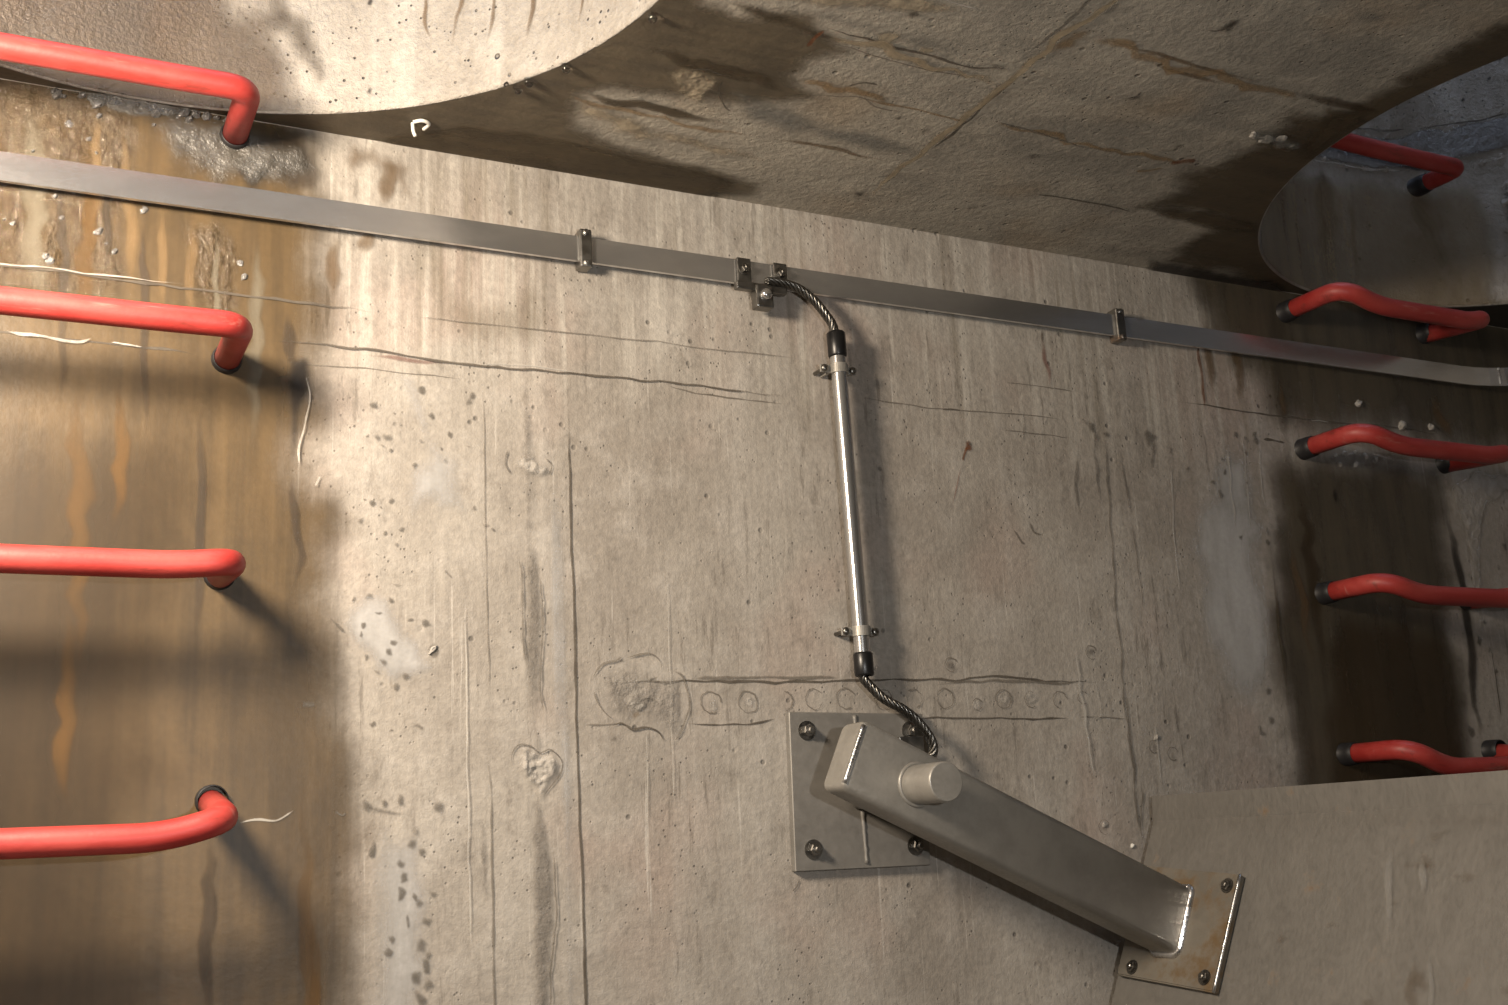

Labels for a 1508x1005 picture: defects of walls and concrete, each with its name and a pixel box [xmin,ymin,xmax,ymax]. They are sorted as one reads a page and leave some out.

water stain [0,0,883,198]
crack [835,31,1087,148]
crack [1035,0,1091,48]
water stain [1147,25,1508,368]
crack [0,263,772,403]
water stain [1197,348,1213,404]
water stain [1233,353,1508,446]
water stain [0,182,355,1005]
water stain [1199,432,1508,785]